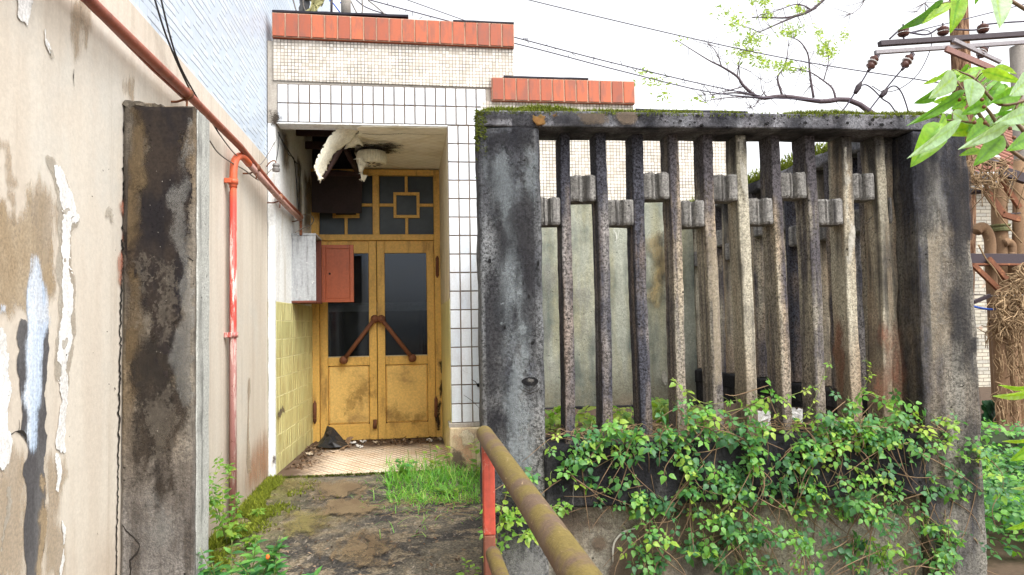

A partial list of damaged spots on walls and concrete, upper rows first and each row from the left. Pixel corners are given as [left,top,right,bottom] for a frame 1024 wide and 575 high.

water stain [71,1,90,57]
peeling [0,327,13,471]
peeling [46,155,80,492]
crack [116,106,140,575]
water stain [123,80,193,508]
water stain [485,270,507,392]
water stain [487,407,508,442]
water stain [492,194,536,341]
water stain [486,112,543,147]
water stain [917,152,937,227]
water stain [949,141,979,371]
water stain [960,438,981,498]